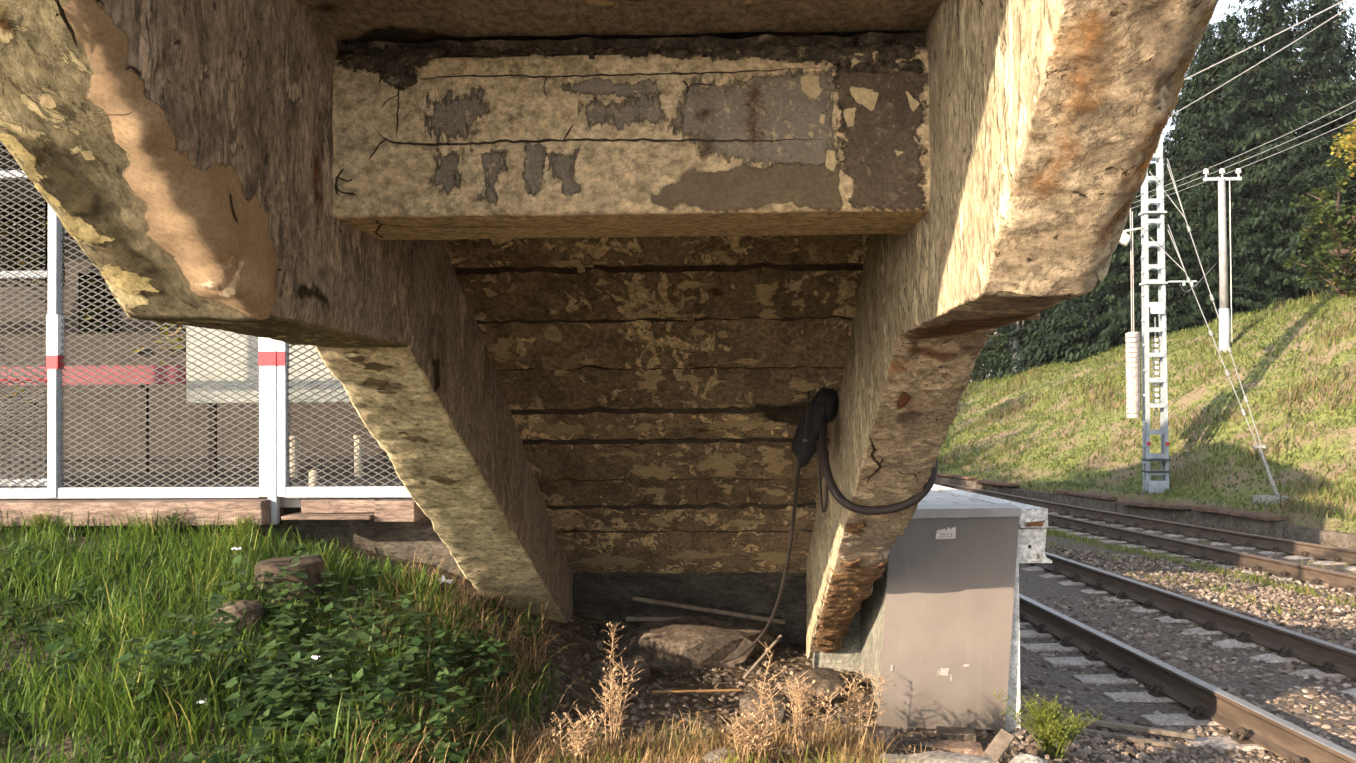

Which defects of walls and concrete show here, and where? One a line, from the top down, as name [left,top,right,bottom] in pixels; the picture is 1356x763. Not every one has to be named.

peeling [39,94,57,110]
crack [335,67,824,239]
peeling [337,41,930,215]
peeling [0,133,115,245]
peeling [90,260,160,295]
peeling [751,284,783,338]
peeling [597,449,677,500]
crack [580,438,781,451]
peeling [683,374,810,517]
crack [863,435,918,486]
spalling [843,520,867,535]
spalling [811,555,889,653]